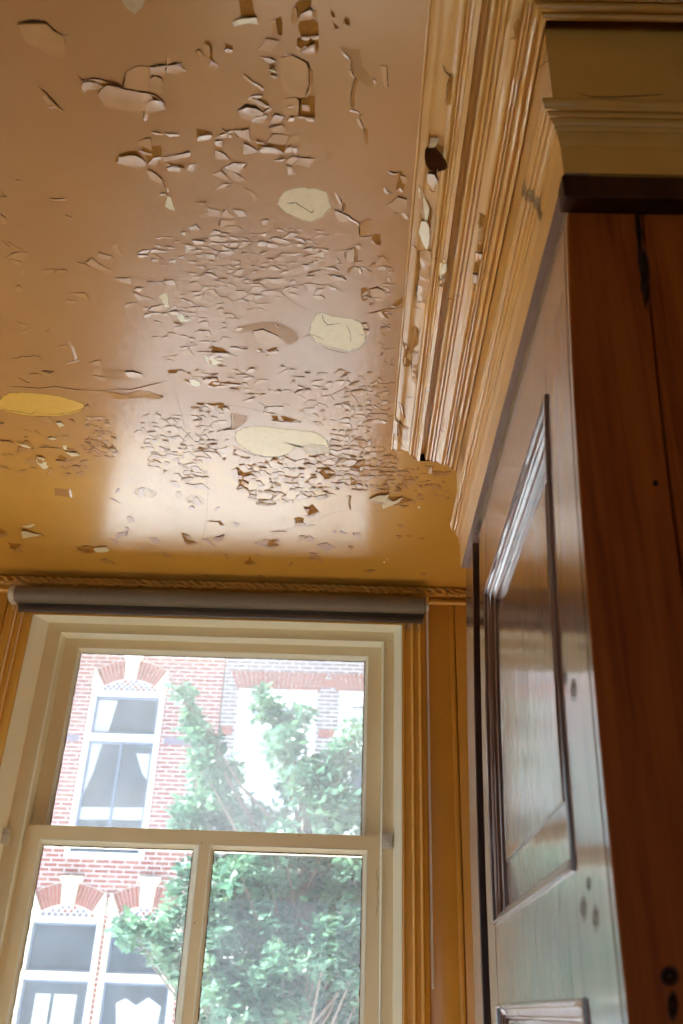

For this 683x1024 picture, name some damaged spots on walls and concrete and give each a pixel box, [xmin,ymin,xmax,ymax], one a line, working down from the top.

peeling [17,20,69,58]
peeling [77,0,319,211]
peeling [337,47,389,144]
peeling [442,65,453,105]
peeling [382,131,447,310]
peeling [42,192,466,565]
peeling [0,403,118,497]
peeling [0,524,45,553]
peeling [245,539,280,578]